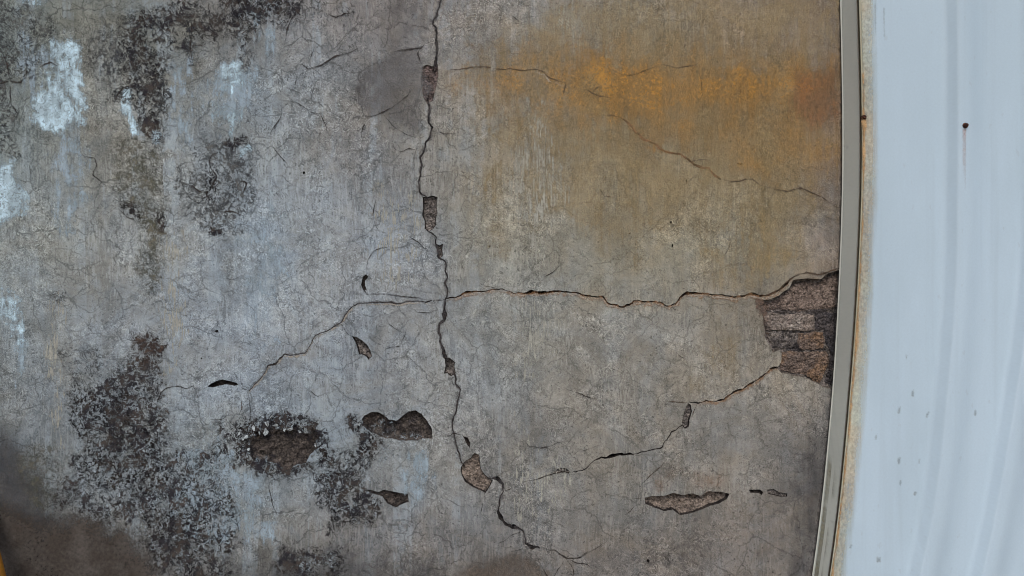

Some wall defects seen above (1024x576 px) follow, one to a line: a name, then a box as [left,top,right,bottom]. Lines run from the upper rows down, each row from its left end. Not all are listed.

crack [271,51,353,161]
crack [361,0,754,200]
crack [188,155,247,214]
spalling [422,196,437,232]
water stain [0,0,392,576]
crack [242,201,837,466]
spalling [758,270,839,389]
spalling [169,415,320,544]
spalling [355,410,433,507]
spalling [461,436,493,493]
crack [481,366,778,576]
spalling [645,491,729,515]